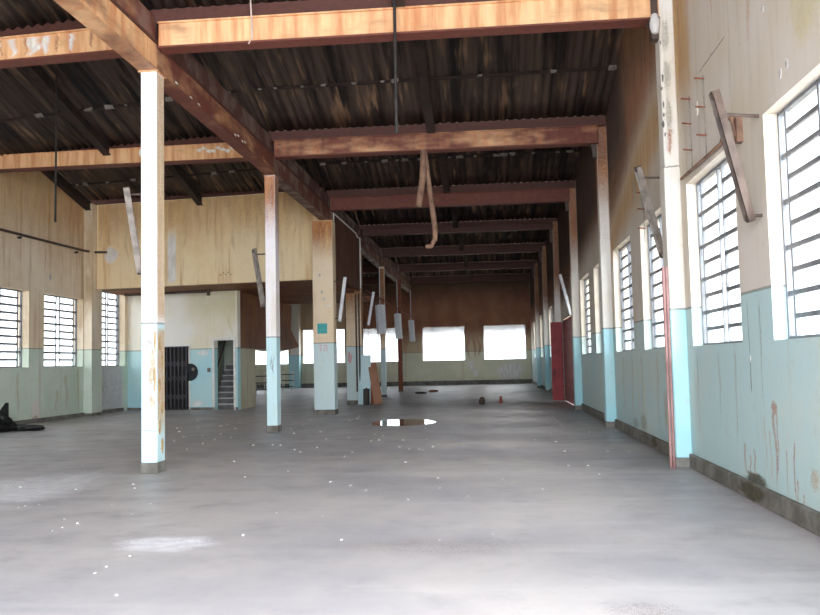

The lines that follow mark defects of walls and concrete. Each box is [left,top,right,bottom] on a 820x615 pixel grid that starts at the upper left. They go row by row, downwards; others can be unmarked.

peeling [0,35,59,58]
peeling [143,330,156,407]
damp [737,442,768,504]
rust [763,401,805,502]